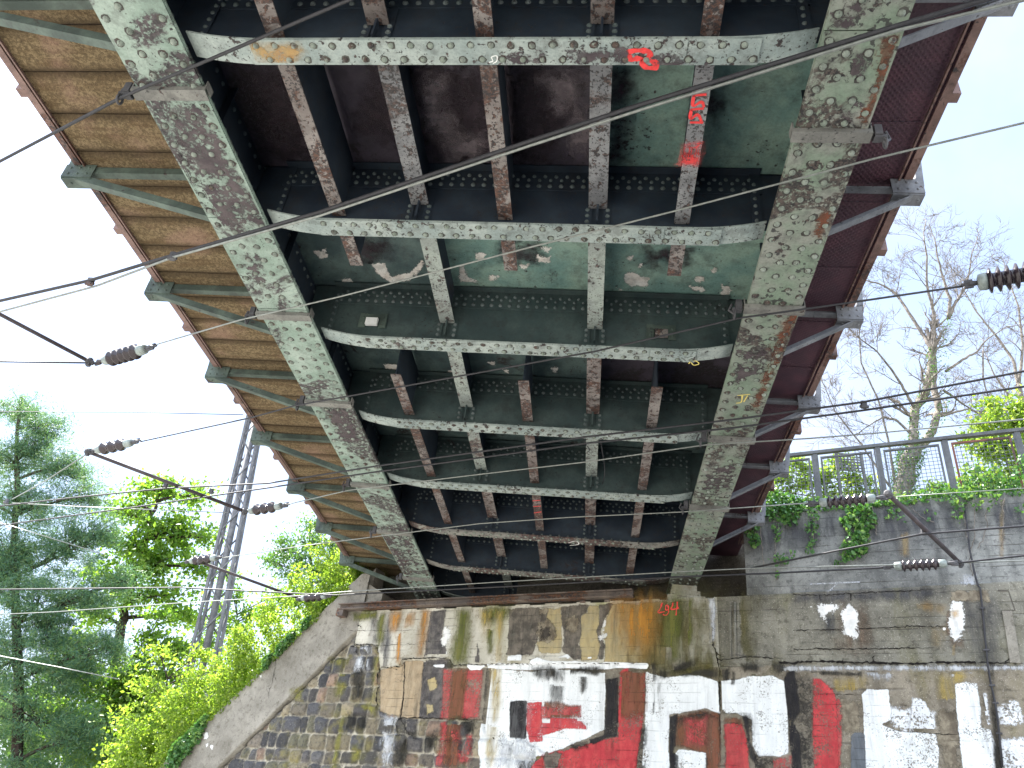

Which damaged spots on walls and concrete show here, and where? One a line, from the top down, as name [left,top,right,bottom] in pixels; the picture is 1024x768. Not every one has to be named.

peeling [372,260,424,282]
peeling [615,255,650,291]
leakage [354,617,389,671]
crack [350,625,634,740]
efflorescence [382,717,396,766]